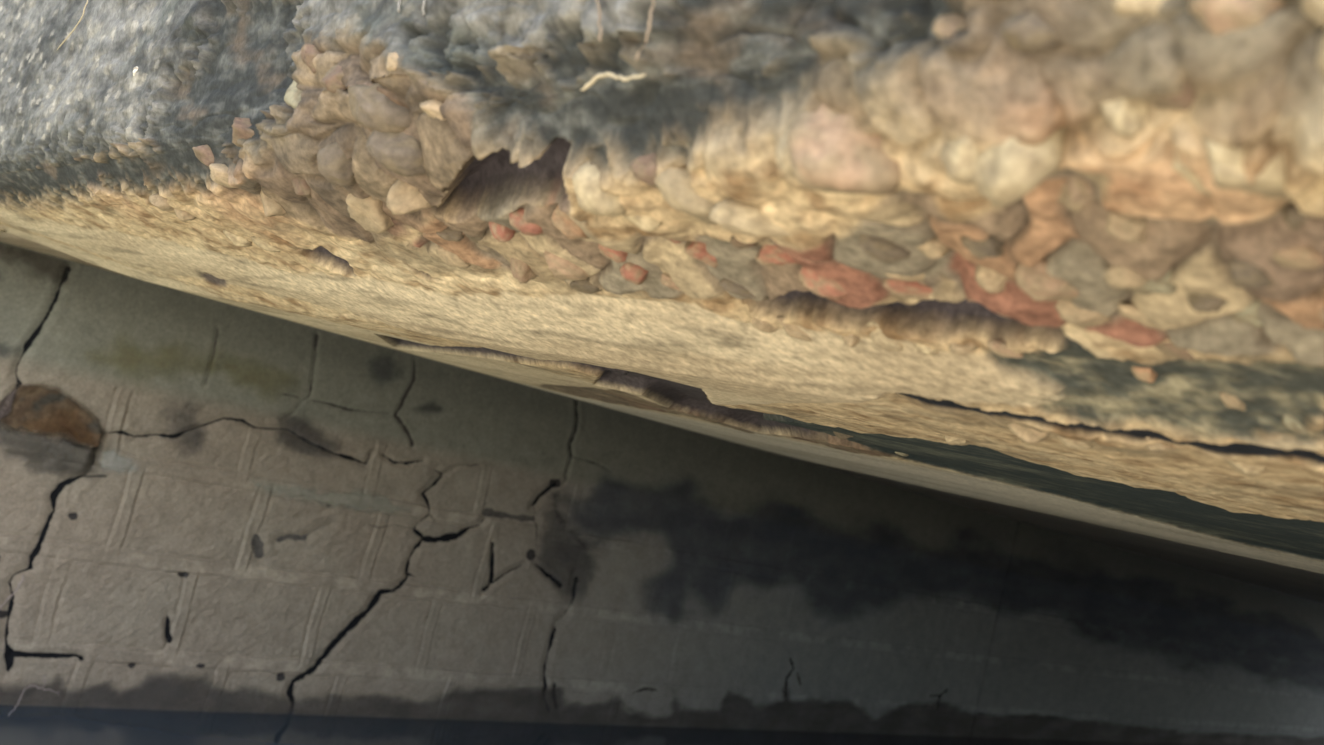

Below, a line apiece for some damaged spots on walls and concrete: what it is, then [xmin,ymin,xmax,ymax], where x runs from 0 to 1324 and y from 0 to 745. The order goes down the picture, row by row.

crack [15,266,71,388]
spalling [0,0,1324,522]
crack [4,329,611,702]
leakage [556,481,1324,686]